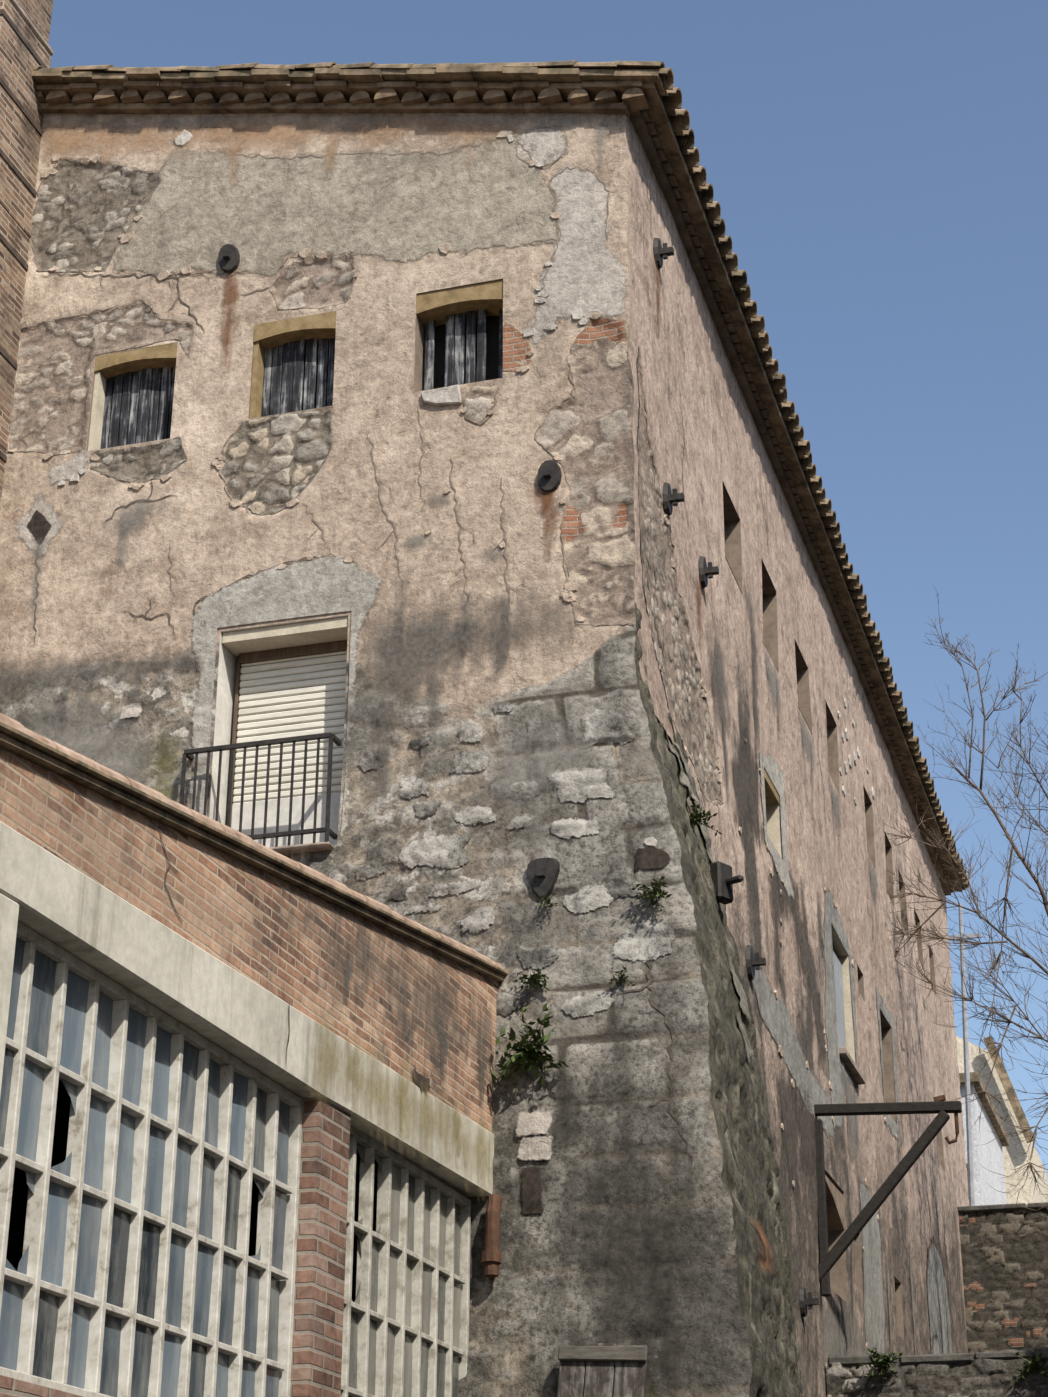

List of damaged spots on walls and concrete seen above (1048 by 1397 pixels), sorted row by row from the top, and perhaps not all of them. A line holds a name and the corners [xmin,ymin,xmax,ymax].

peeling [8,126,832,1095]
water stain [710,641,729,799]
water stain [746,594,779,740]
crack [156,826,183,921]
water stain [353,1071,490,1172]